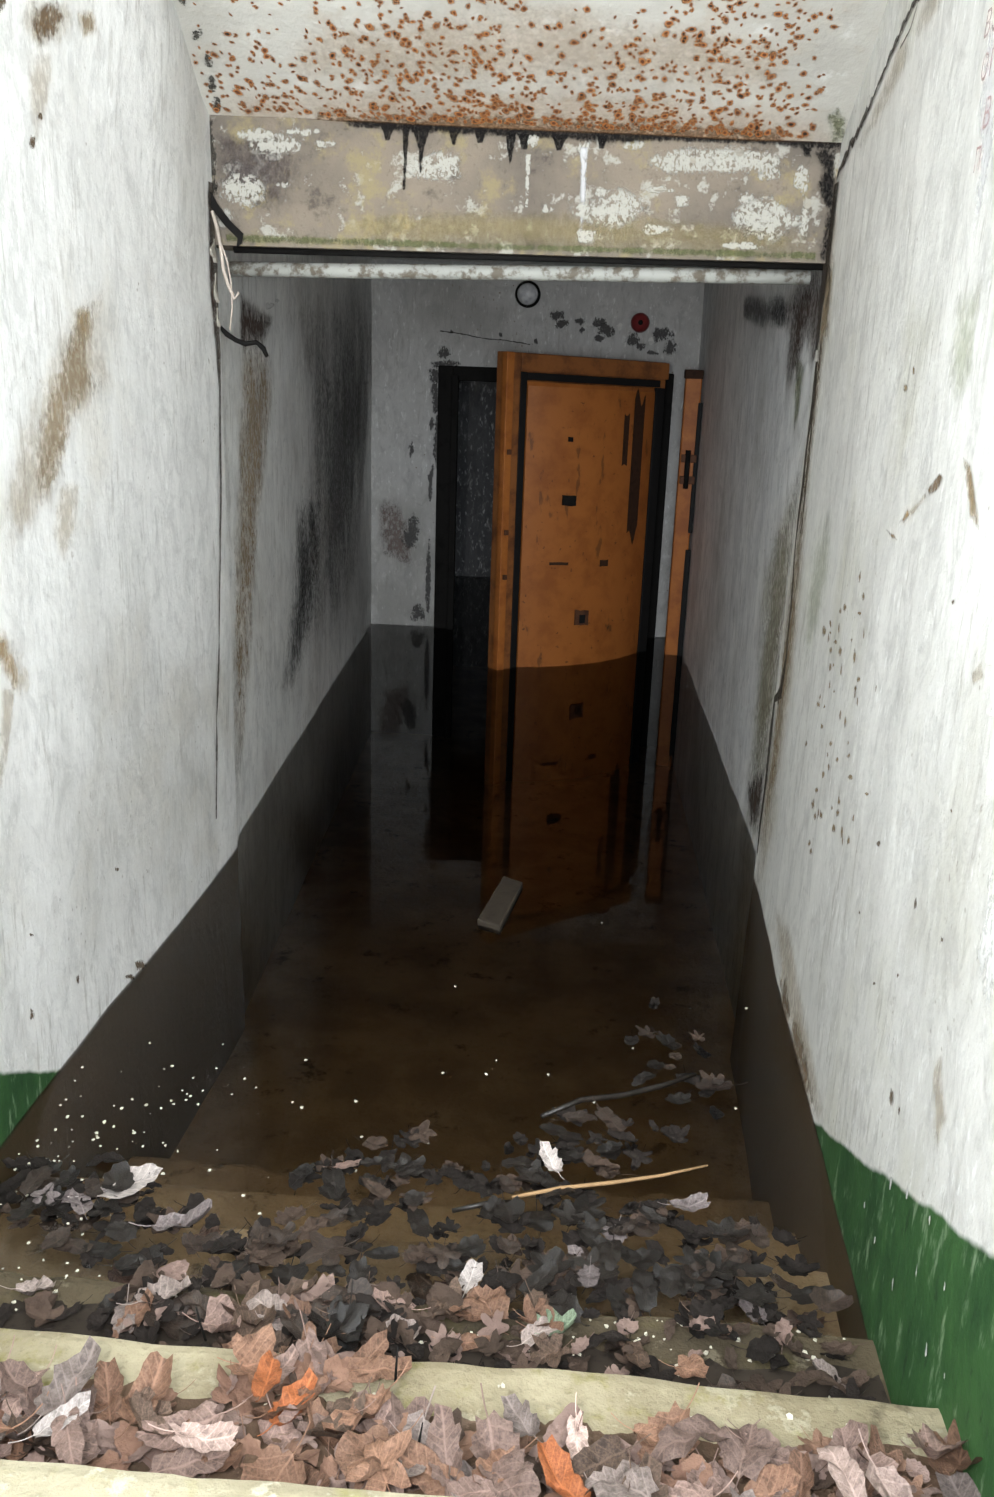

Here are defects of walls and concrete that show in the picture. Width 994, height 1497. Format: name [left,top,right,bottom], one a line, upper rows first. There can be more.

rust [192,0,838,142]
water stain [223,141,289,203]
peeling [406,151,460,180]
water stain [346,120,842,221]
peeling [542,140,835,260]
water stain [40,314,90,488]
water stain [226,235,831,428]
water stain [235,296,270,744]
water stain [287,310,372,687]
water stain [749,454,810,824]